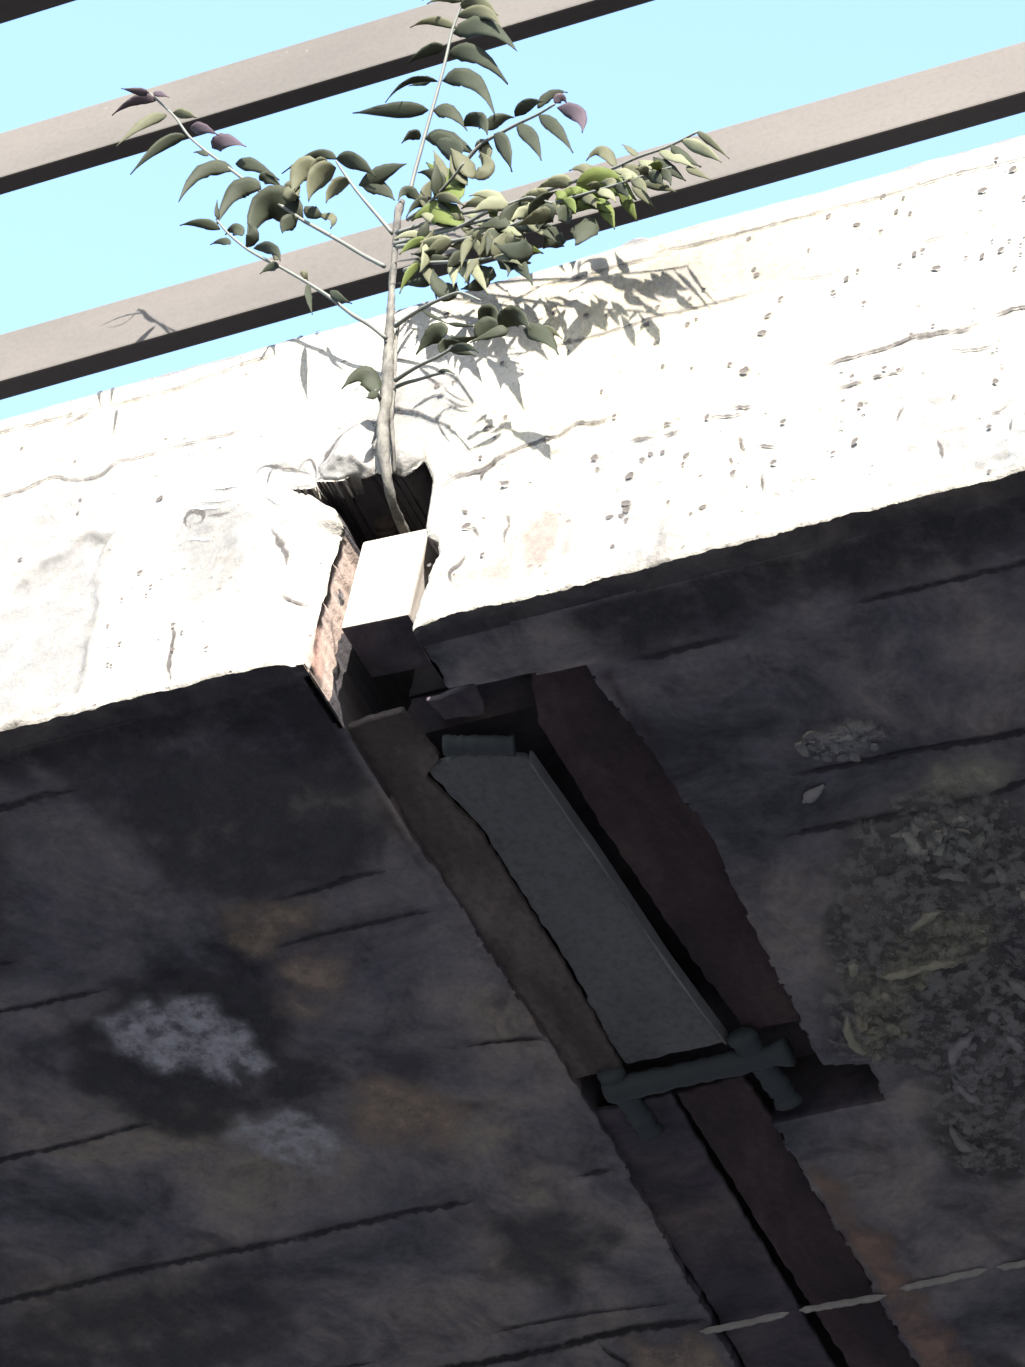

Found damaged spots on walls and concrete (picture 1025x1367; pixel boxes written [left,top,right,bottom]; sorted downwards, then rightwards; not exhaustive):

crack [828,305,1025,388]
leakage [877,838,1025,1086]
leakage [75,974,340,1171]
crack [444,1320,701,1367]